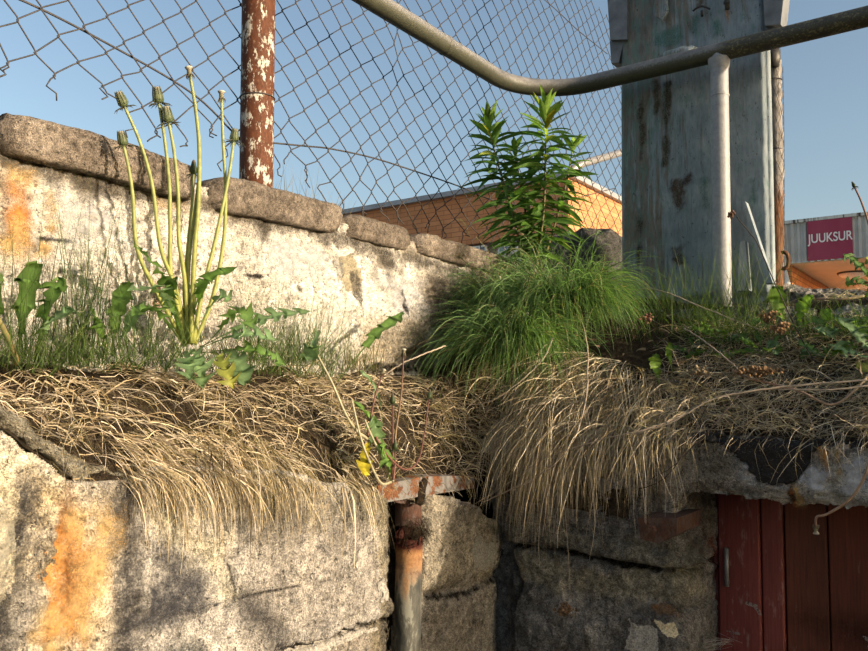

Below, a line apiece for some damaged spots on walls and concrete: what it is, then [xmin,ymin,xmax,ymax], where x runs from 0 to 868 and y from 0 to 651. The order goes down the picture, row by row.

damp [638,80,672,154]
rust [4,172,32,255]
rust [377,474,475,502]
spalling [803,493,868,509]
rust [33,511,112,651]